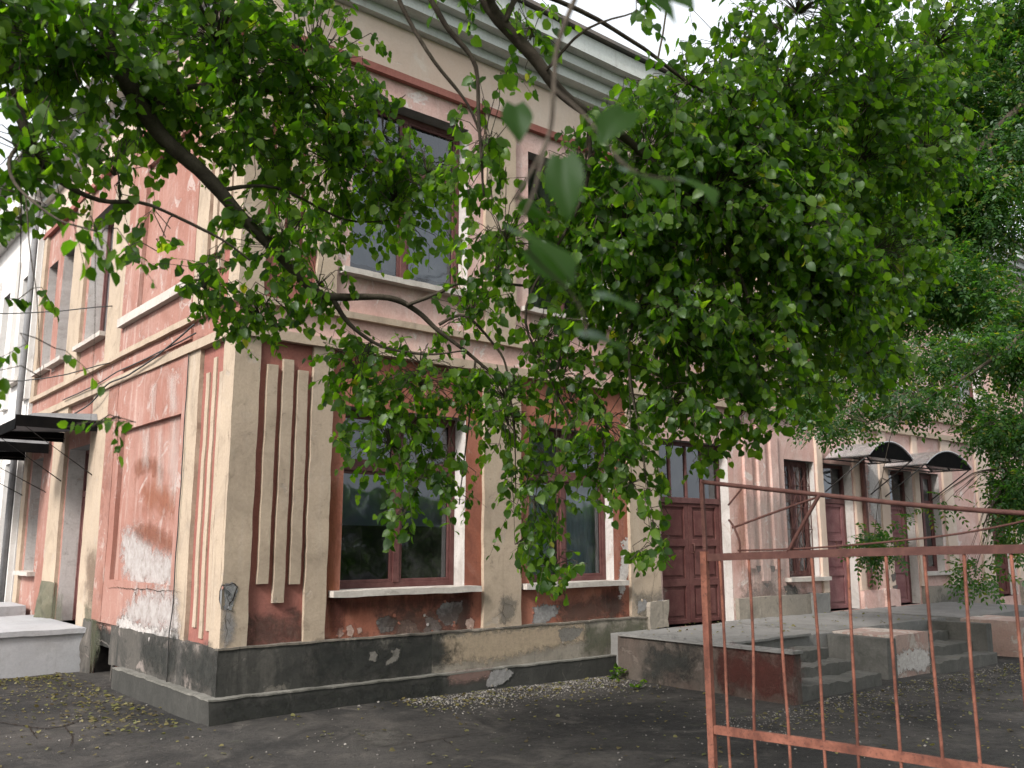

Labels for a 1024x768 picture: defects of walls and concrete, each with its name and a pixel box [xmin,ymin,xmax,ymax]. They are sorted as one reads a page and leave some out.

flaking render [116,528,181,641]
leakage [142,631,217,695]
flaking render [219,582,238,646]
leakage [224,594,469,723]
flaking render [369,648,400,666]
flaking render [423,600,584,688]
peeling [897,647,931,676]